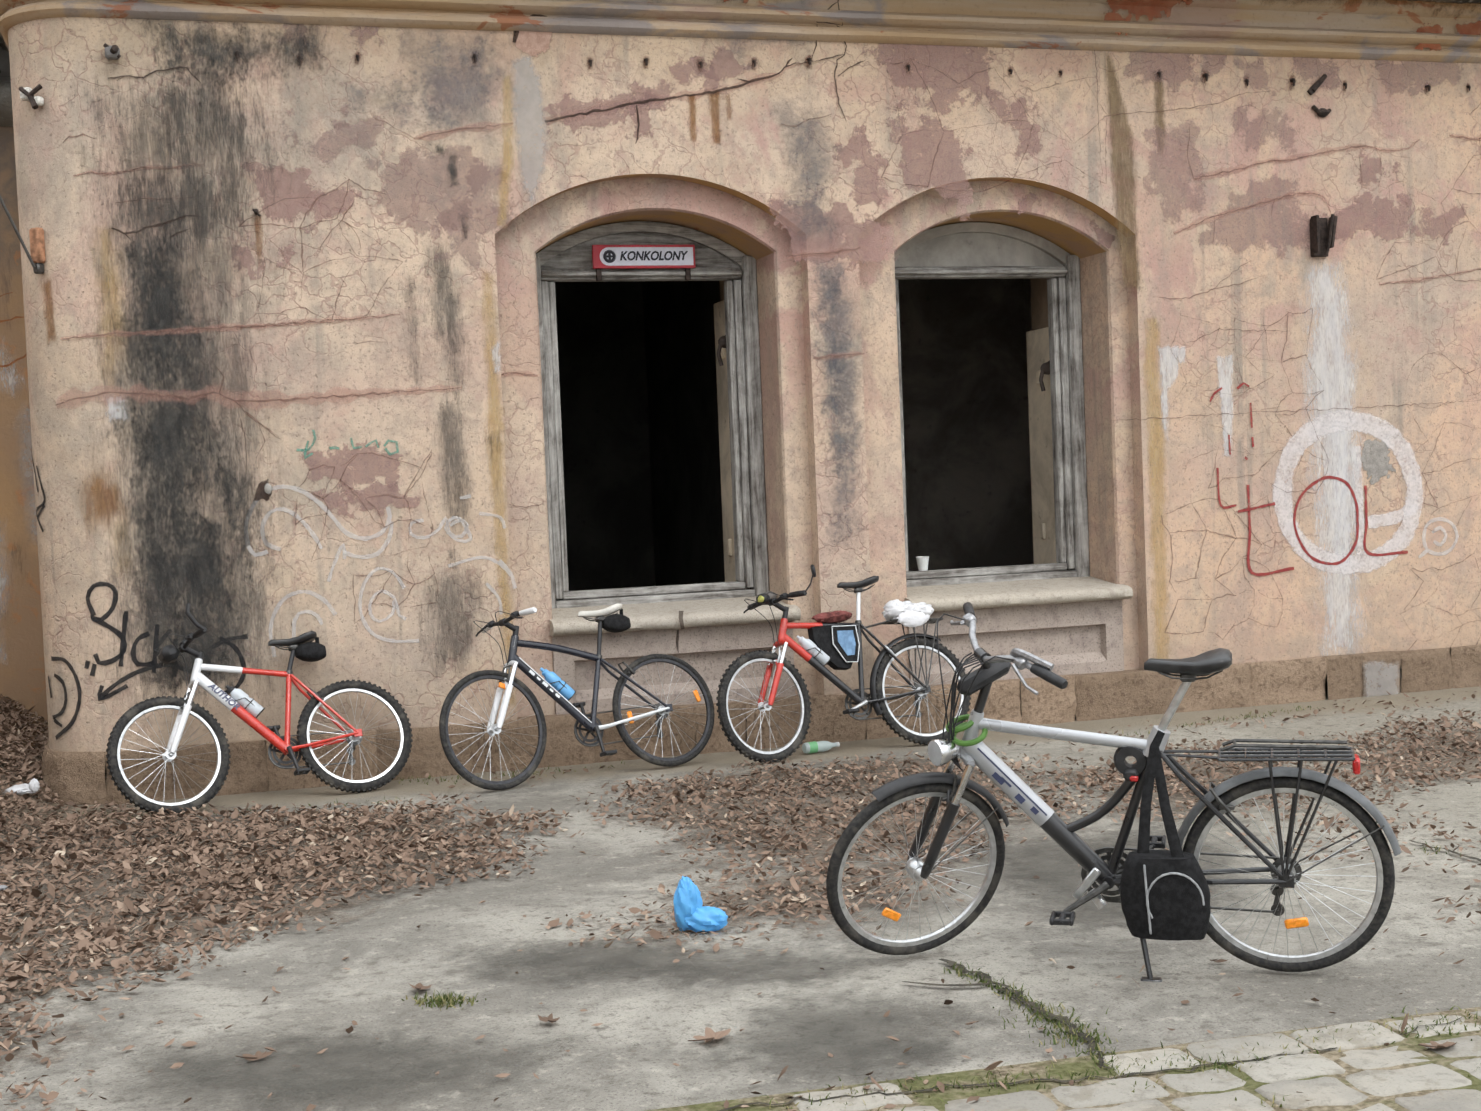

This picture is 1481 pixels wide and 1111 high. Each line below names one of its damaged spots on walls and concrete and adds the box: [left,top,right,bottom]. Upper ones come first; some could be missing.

peeling [1104,0,1193,36]
crack [372,0,1033,192]
rust [690,93,720,142]
peeling [770,43,1041,267]
peeling [1325,148,1466,245]
rust [44,282,54,337]
water stain [109,26,320,686]